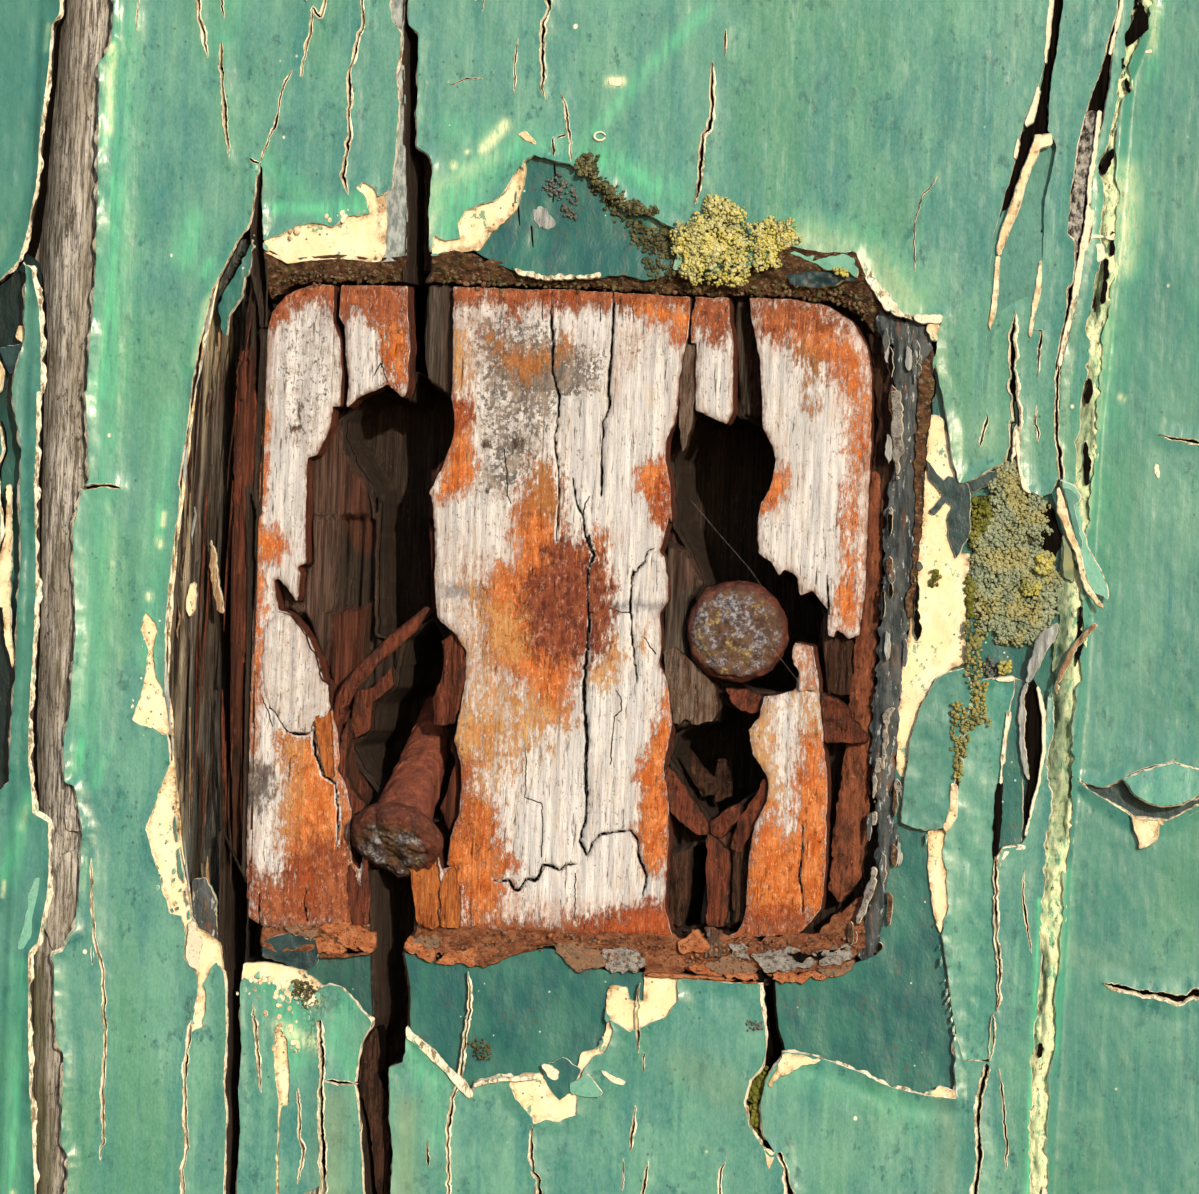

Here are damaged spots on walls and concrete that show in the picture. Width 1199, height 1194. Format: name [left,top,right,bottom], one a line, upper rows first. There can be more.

peeling [0,0,113,1194]
crack [195,0,339,1194]
corrosion [233,349,378,971]
peeling [264,0,408,264]
crack [402,0,434,287]
crack [494,292,656,921]
corrosion [433,287,733,508]
corrosion [404,452,871,984]
corrosion [752,298,871,632]
peeling [768,368,1109,1098]
peeling [405,948,678,1123]
crack [969,857,1032,1194]